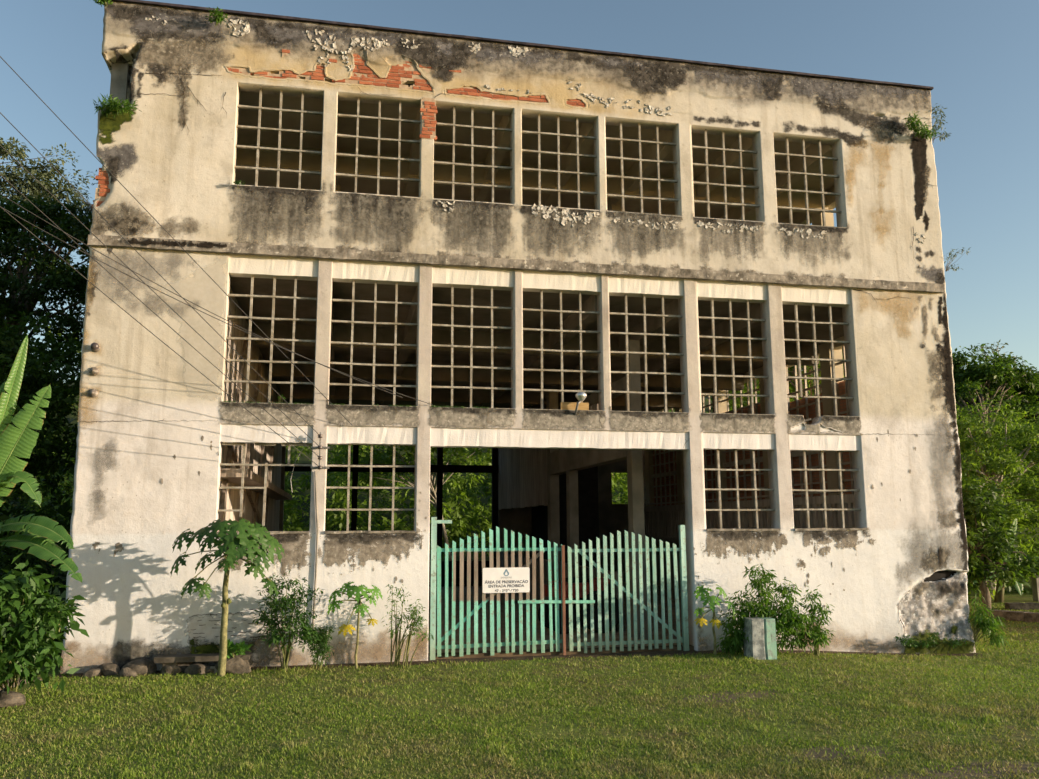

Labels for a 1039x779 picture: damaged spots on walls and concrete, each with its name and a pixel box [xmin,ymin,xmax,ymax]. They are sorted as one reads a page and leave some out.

flaking render [224,29,550,140]
leakage [104,2,931,231]
peeling [564,80,672,116]
flaking render [92,168,110,209]
leakage [91,184,849,278]
leakage [916,247,968,572]
leakage [95,445,115,512]
peeling [219,483,430,576]
spalling [897,570,976,654]